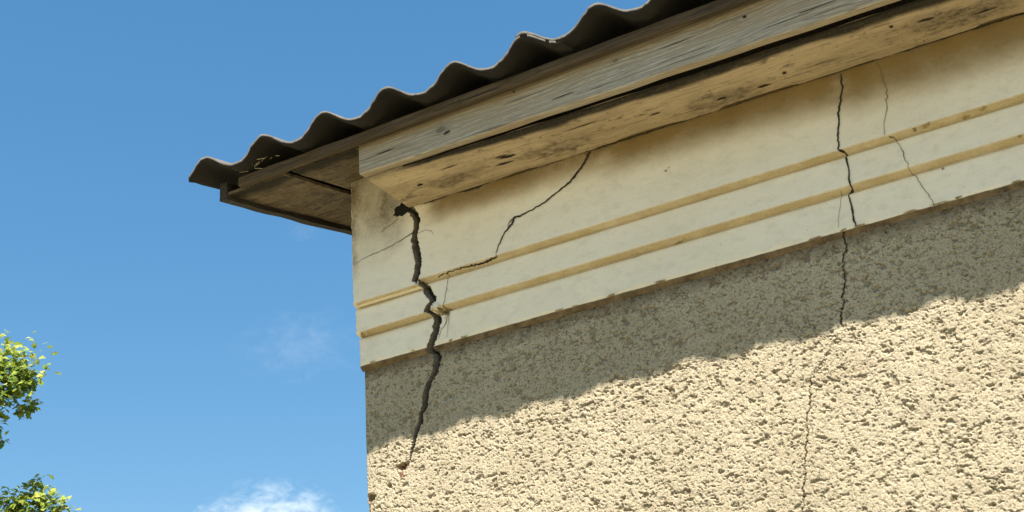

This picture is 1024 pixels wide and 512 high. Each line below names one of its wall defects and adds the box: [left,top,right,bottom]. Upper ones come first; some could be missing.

crack [353,13,1024,512]